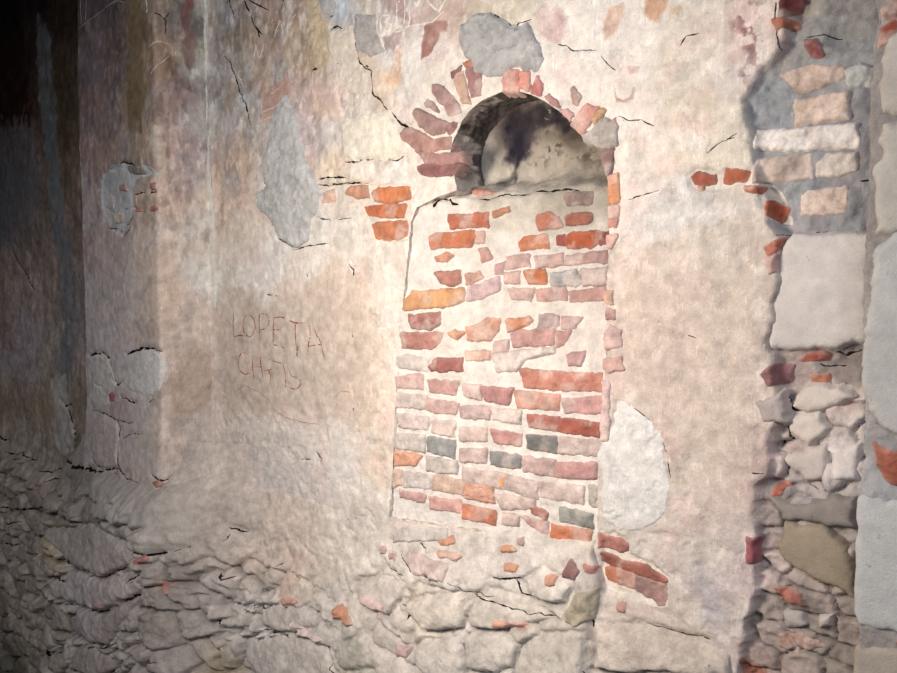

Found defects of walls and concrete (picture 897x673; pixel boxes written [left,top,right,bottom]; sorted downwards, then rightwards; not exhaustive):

crack [224,56,250,124]
crack [312,16,409,127]
peeling [341,113,412,162]
spalling [101,123,175,235]
spalling [319,181,418,244]
spalling [683,0,874,599]
crack [91,347,163,359]
crack [0,380,169,483]
crack [0,506,42,552]
crack [384,542,559,618]
spalling [597,529,670,608]
spalling [738,657,767,673]